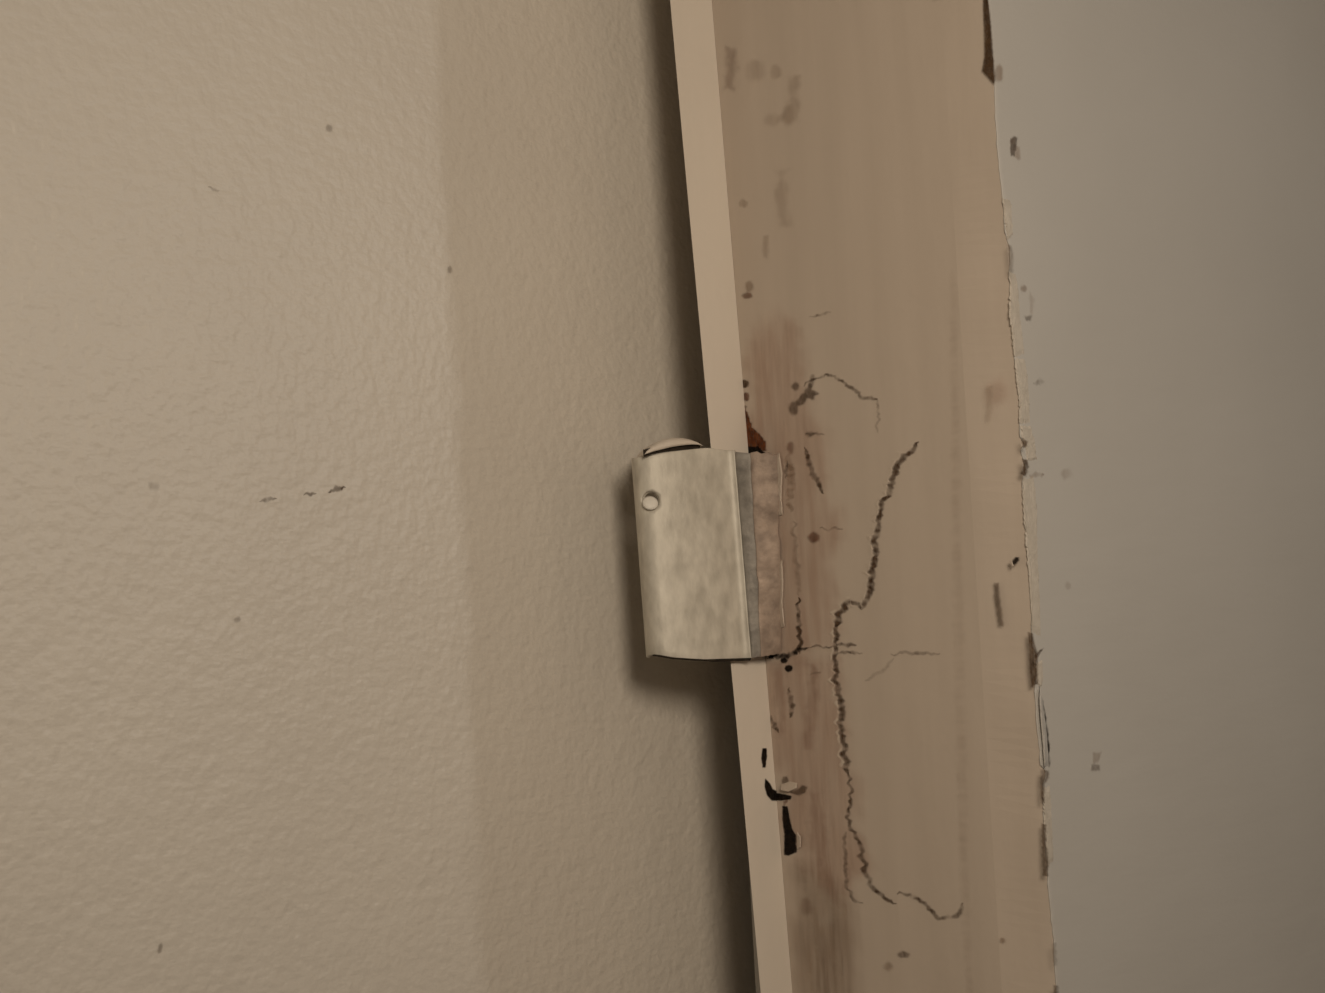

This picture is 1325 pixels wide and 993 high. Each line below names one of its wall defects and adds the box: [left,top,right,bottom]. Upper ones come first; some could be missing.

peeling [761,748,805,856]
crack [768,441,959,914]